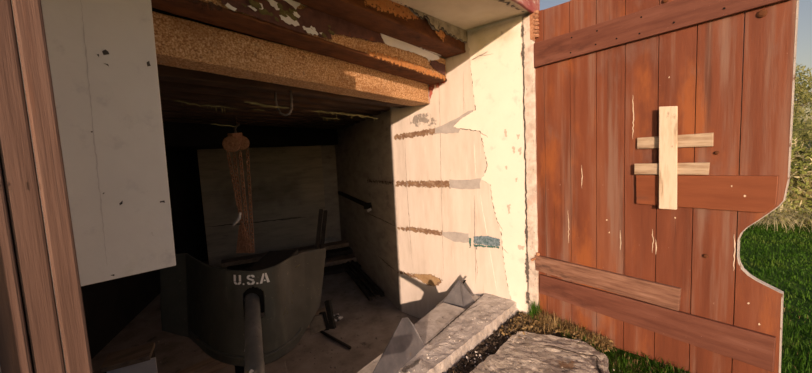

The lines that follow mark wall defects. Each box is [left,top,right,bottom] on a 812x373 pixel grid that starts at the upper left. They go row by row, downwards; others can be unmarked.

peeling [225,0,335,38]
spalling [401,3,468,43]
peeling [380,33,441,61]
spalling [394,110,473,140]
spalling [367,178,481,189]